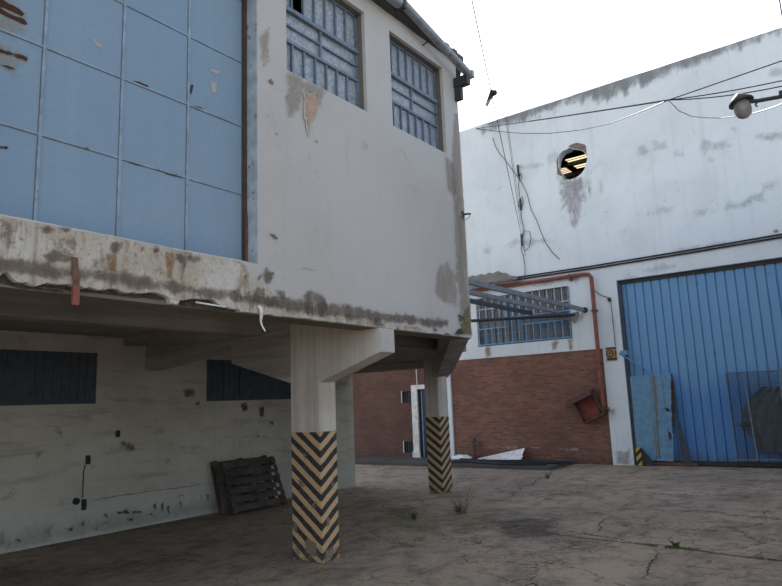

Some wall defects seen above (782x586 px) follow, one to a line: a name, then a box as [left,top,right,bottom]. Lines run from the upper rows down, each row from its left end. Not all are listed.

rust [0,0,27,25]
peeling [303,92,320,142]
leakage [44,250,68,262]
spalling [0,273,165,300]